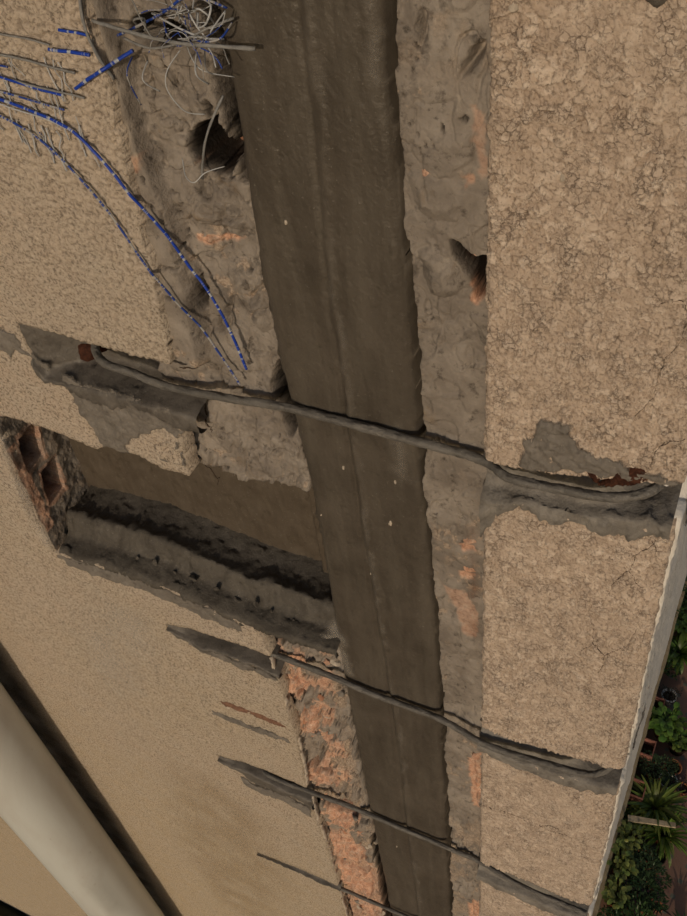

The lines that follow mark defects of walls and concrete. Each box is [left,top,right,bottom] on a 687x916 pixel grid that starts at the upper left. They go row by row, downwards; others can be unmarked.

spalling [78,343,108,362]
spalling [587,467,648,487]
spalling [286,673,322,733]
spalling [307,755,341,787]
spalling [329,798,379,916]